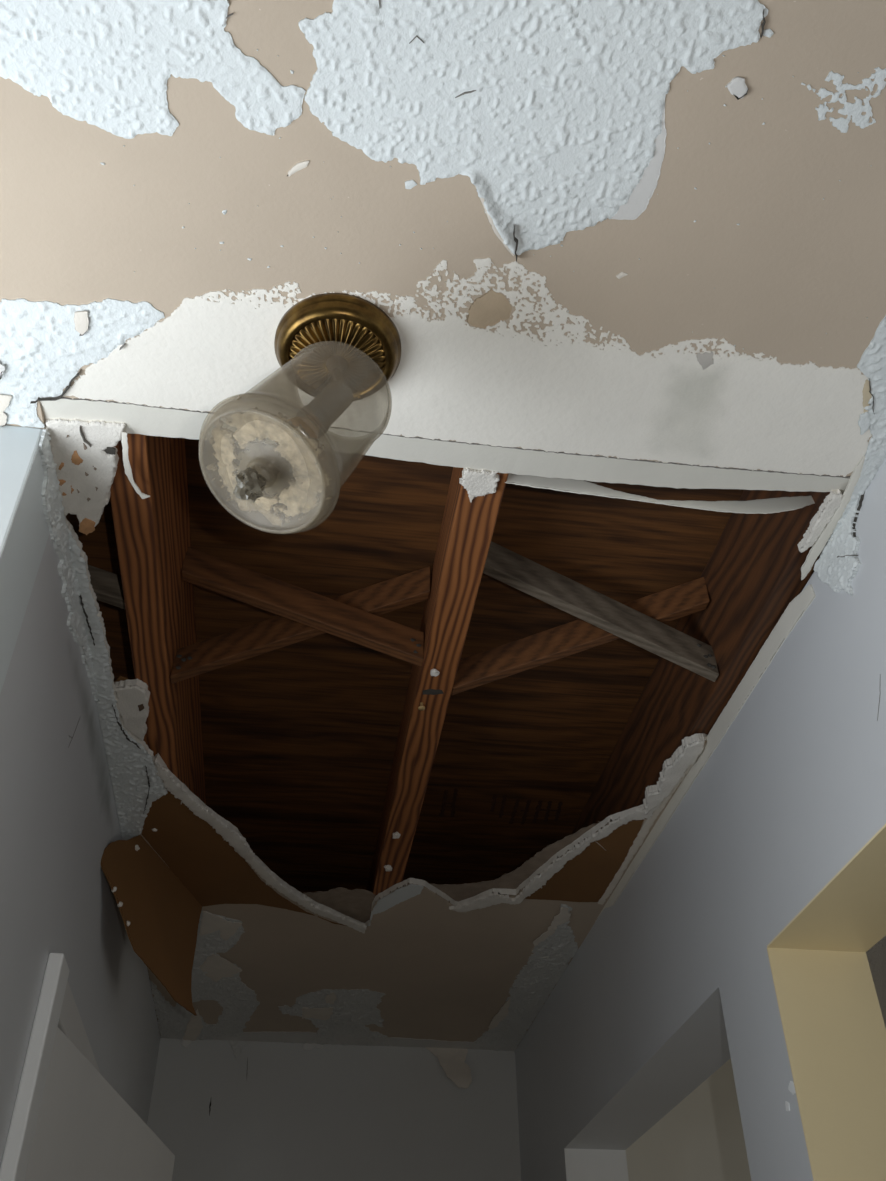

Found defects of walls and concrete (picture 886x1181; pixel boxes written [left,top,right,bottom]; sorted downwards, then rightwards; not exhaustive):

peeling [0,0,774,262]
peeling [0,298,165,428]
peeling [821,316,886,554]
spalling [598,764,694,905]
peeling [150,911,260,1041]